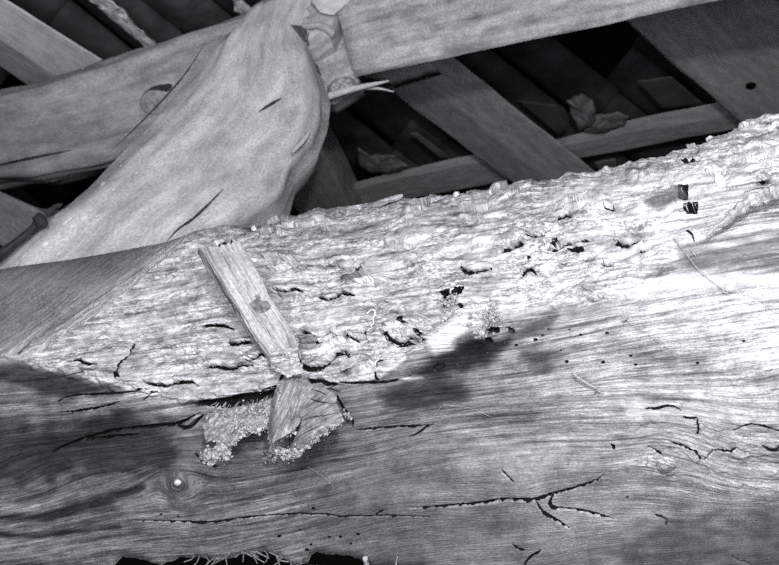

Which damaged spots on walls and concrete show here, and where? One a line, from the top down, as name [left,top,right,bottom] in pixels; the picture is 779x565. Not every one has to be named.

spalling [190,385,277,408]
crack [54,412,204,451]
crack [644,405,779,459]
crack [135,470,610,528]